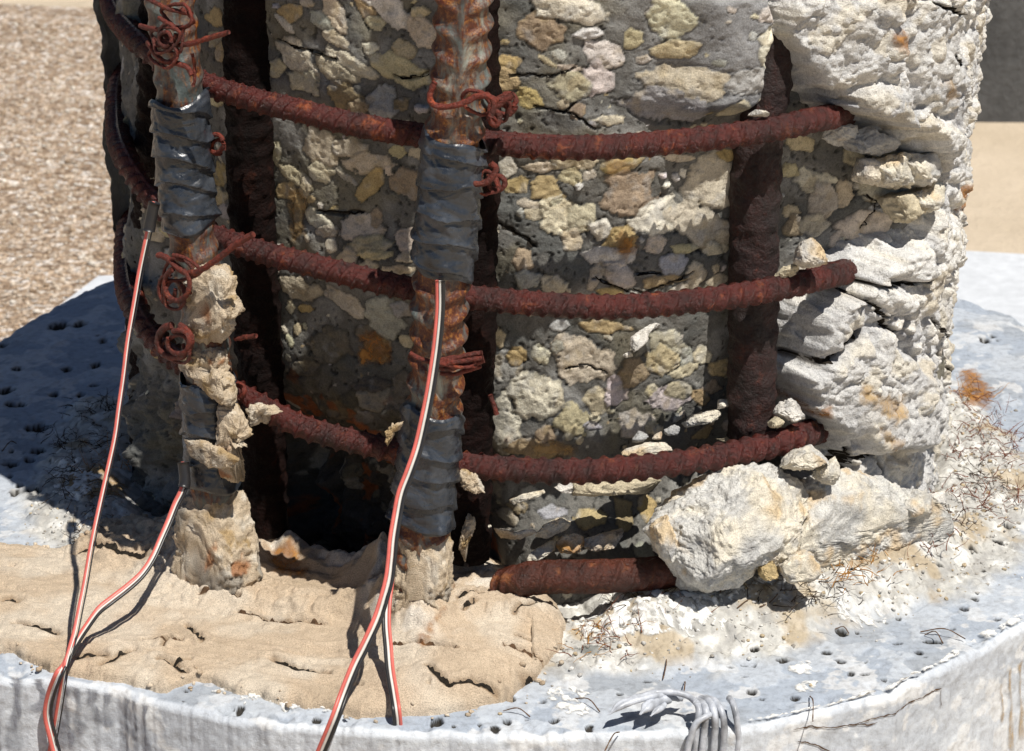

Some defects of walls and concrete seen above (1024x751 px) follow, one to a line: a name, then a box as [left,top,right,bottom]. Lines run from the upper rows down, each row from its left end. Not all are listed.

spalling [202,0,224,77]
spalling [265,0,438,123]
spalling [498,0,740,135]
spalling [211,98,230,229]
spalling [271,117,421,277]
spalling [495,148,734,295]
spalling [778,124,946,271]
spalling [278,270,414,438]
spalling [492,309,729,460]
spalling [286,432,397,553]
spalling [488,469,711,566]
spalling [758,456,784,472]